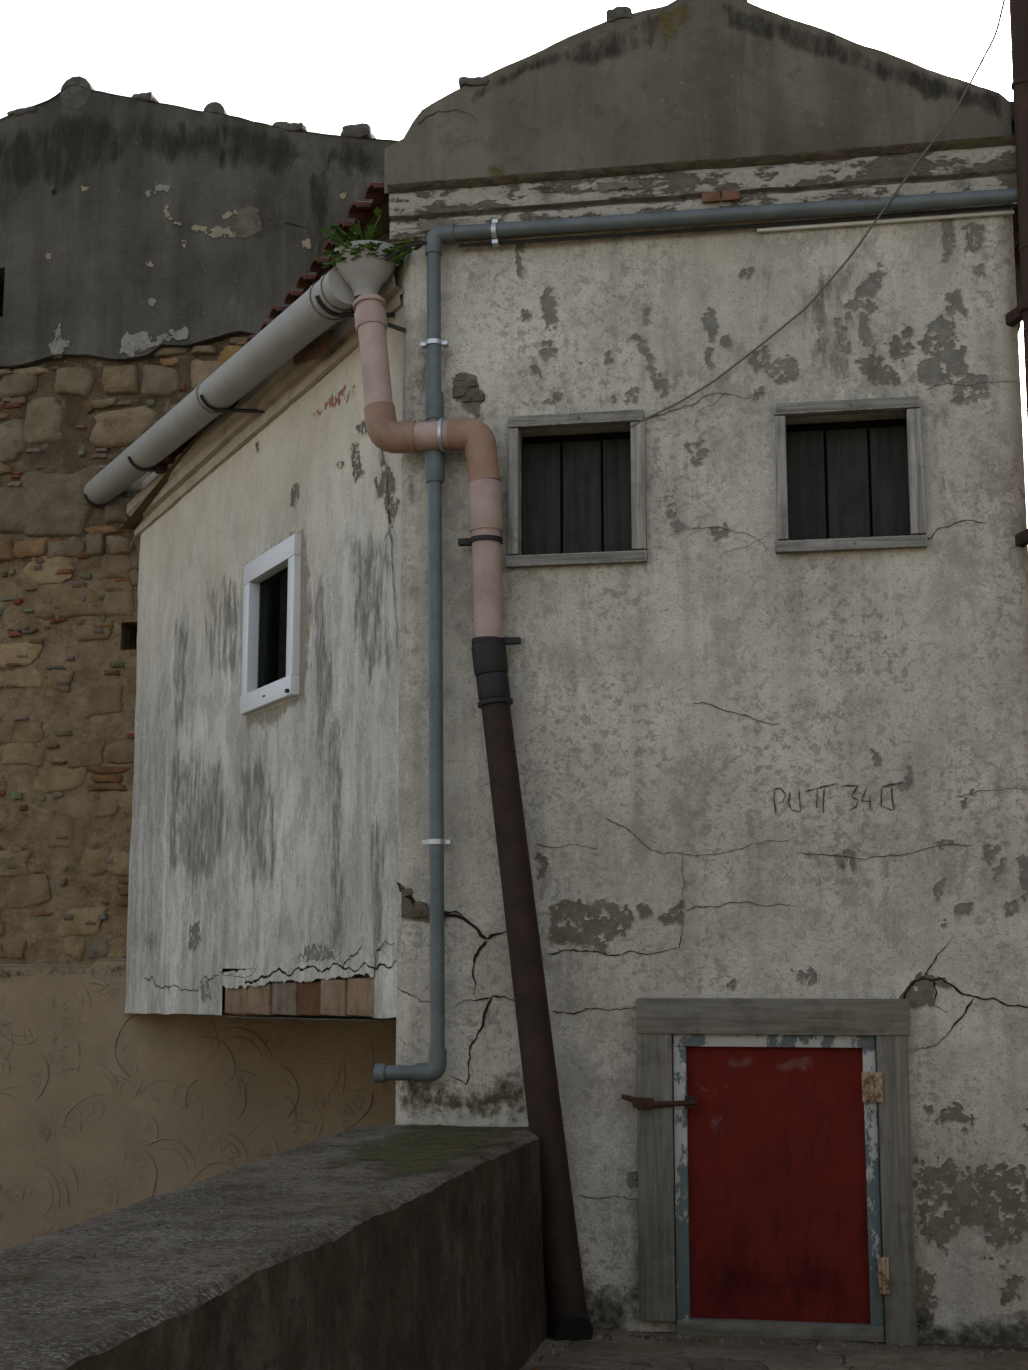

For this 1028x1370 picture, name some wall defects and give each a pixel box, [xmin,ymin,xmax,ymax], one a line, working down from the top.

damp [909,71,1000,113]
peeling [814,261,993,407]
damp [354,550,388,676]
damp [170,754,275,881]
damp [315,596,342,947]
spalling [200,941,375,1017]
crack [144,882,513,1085]
crack [552,1006,634,1014]
peeling [547,897,686,956]
crack [535,817,970,956]
crack [903,937,1028,1052]
peeling [912,1155,1028,1327]